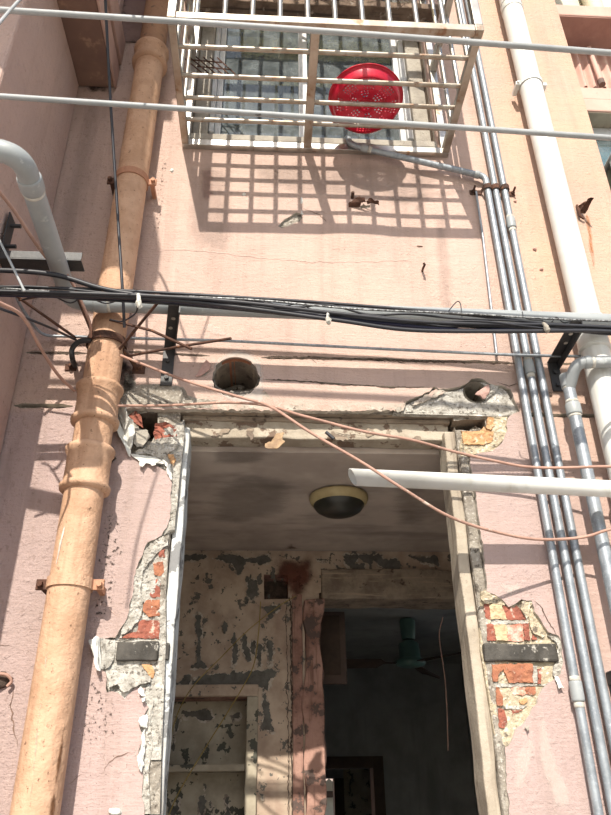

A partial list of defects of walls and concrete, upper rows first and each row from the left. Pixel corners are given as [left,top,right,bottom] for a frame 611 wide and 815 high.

flaking render [195,360,211,377]
crack [261,356,515,392]
flaking render [88,373,518,815]
flaking render [479,590,564,747]